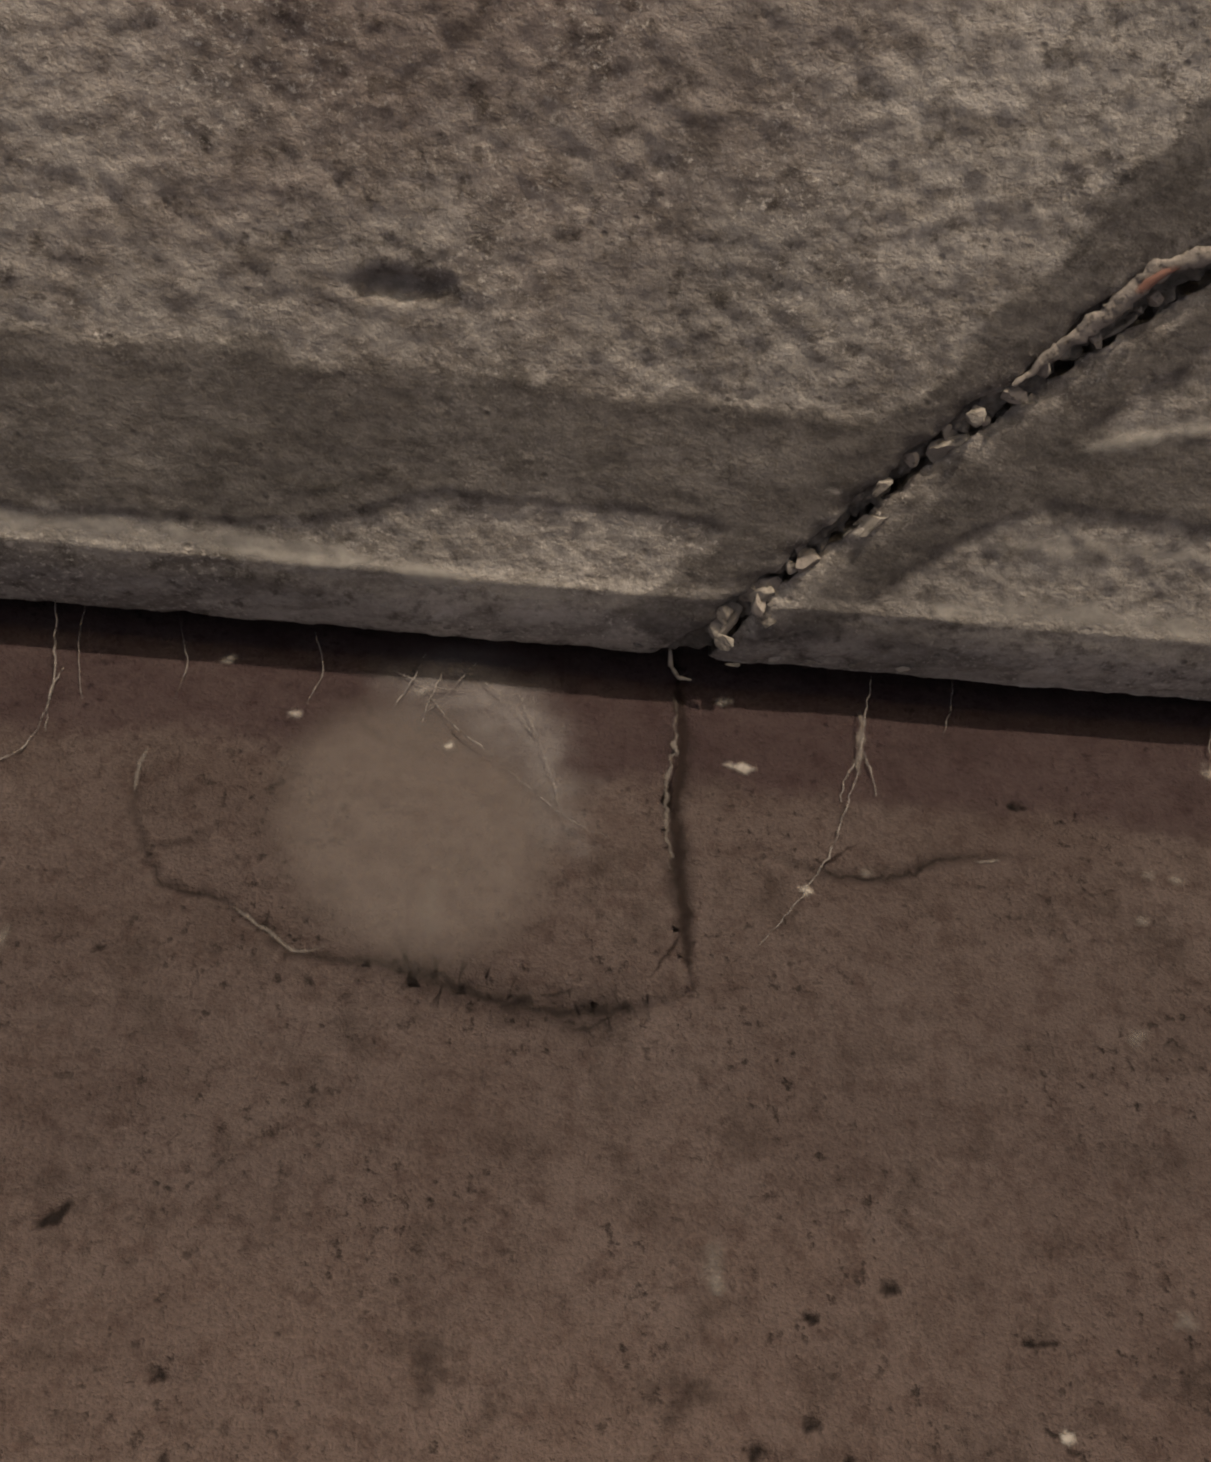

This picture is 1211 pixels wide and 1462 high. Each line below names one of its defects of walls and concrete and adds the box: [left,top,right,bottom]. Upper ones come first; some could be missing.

crack [658,679,693,968]